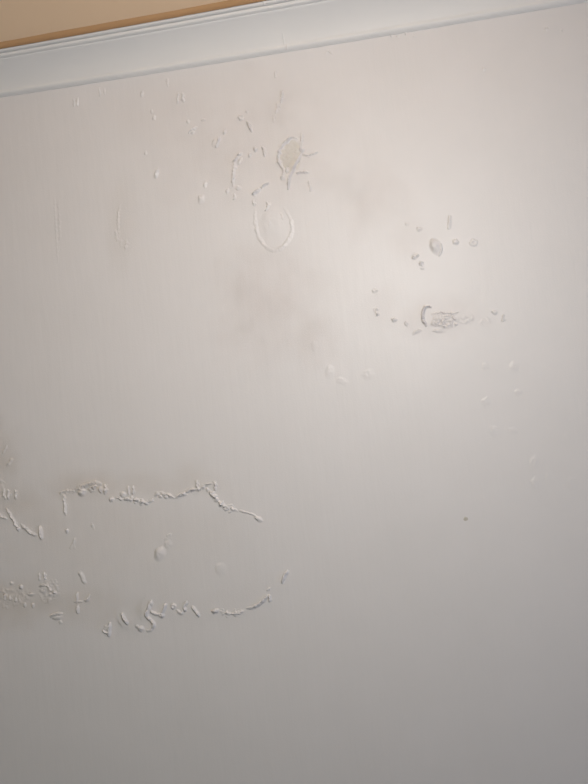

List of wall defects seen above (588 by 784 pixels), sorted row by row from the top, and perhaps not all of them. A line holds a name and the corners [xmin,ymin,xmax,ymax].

peeling [225,132,319,211]